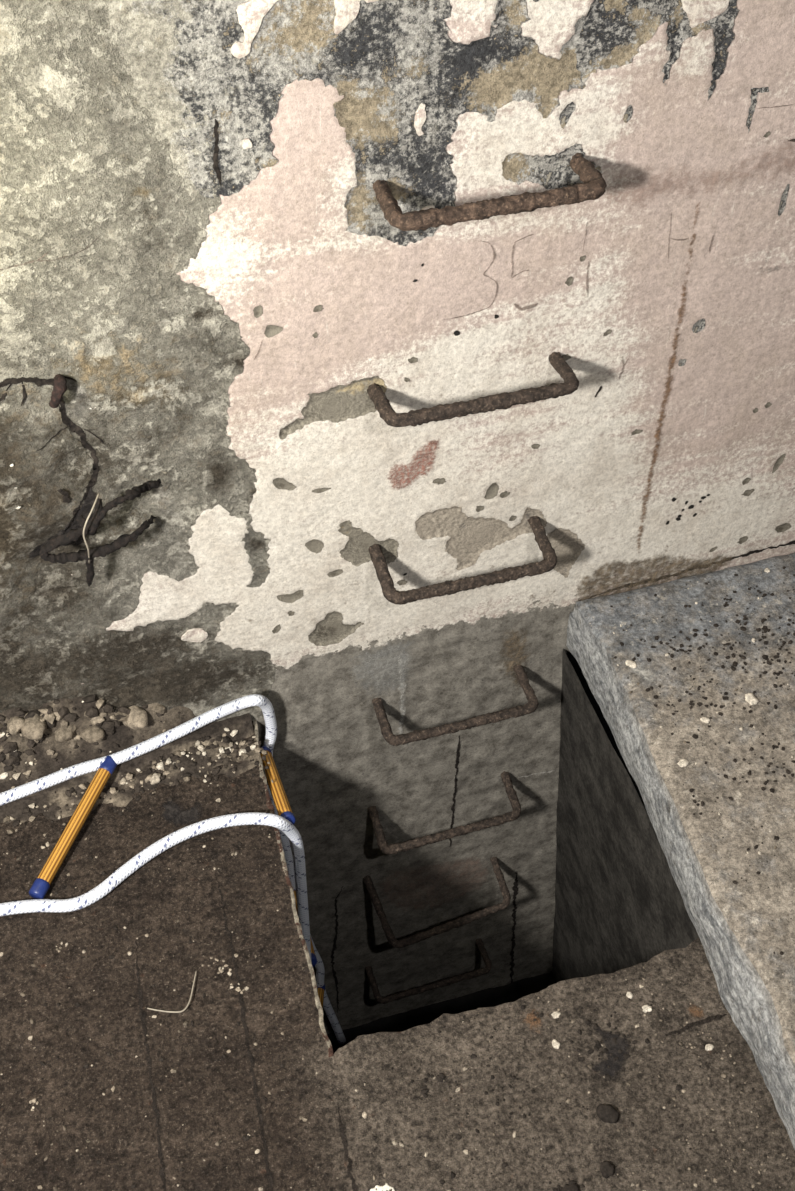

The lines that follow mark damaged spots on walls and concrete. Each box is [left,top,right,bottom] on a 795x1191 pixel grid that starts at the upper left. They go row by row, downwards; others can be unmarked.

flaking render [746,87,769,132]
flaking render [0,0,739,722]
crack [0,376,104,532]